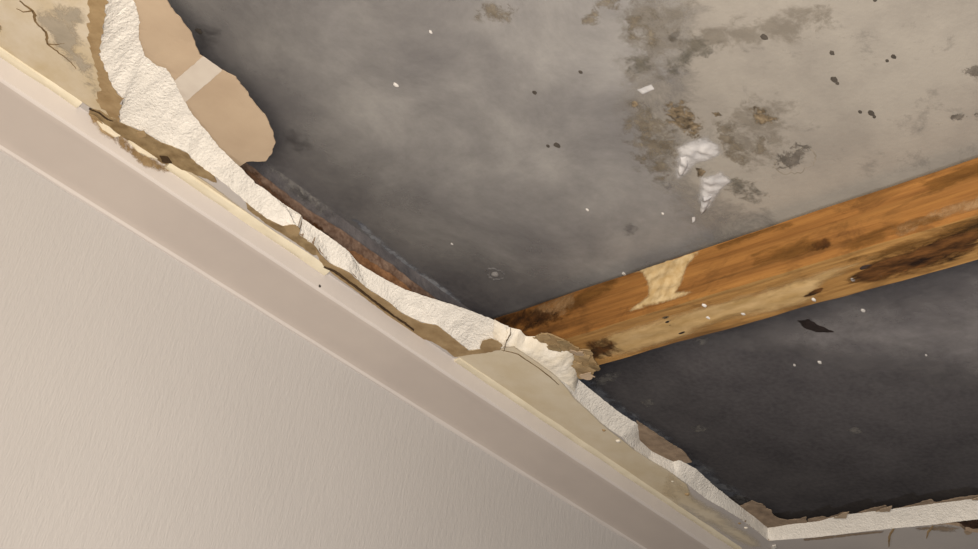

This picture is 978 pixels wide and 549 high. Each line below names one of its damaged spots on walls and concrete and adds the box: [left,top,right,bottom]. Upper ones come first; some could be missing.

peeling [38,0,978,357]
peeling [775,278,978,373]
spalling [558,378,807,540]